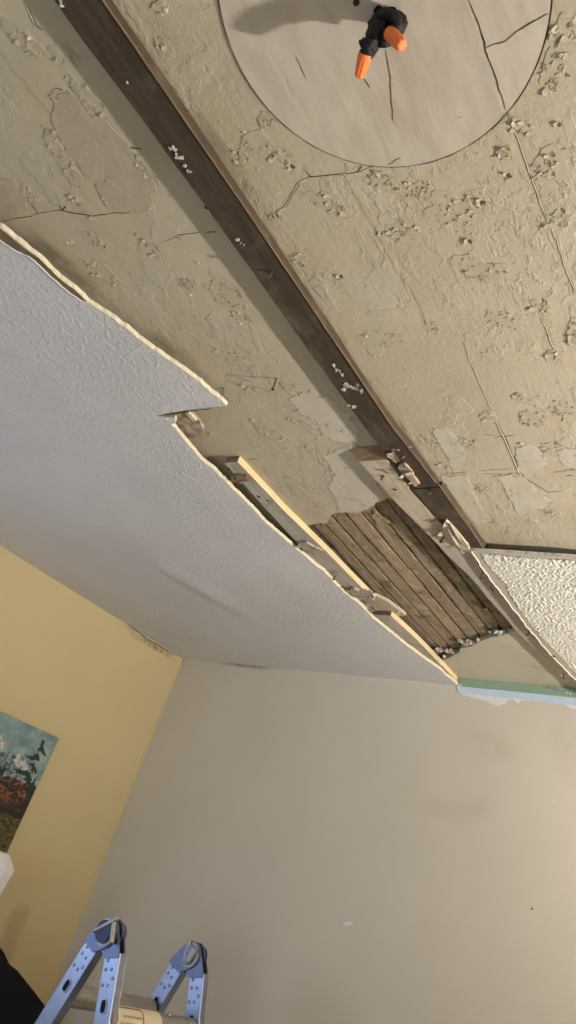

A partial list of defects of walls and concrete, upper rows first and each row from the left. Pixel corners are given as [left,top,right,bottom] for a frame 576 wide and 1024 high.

crack [2,204,130,222]
crack [267,158,427,324]
crack [469,0,576,294]
peeling [289,389,384,523]
peeling [432,428,576,525]